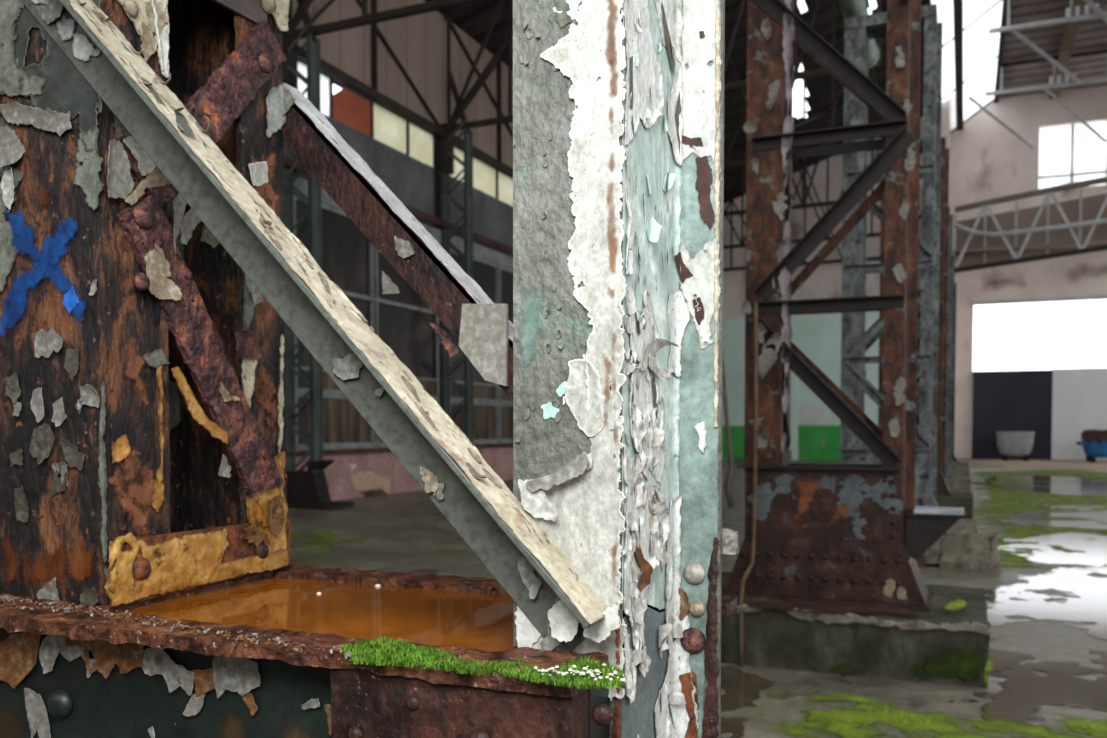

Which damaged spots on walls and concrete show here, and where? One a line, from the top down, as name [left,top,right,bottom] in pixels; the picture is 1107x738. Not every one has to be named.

corrosion [606,0,617,94]
corrosion [250,153,278,213]
corrosion [607,184,617,271]
corrosion [125,340,149,405]
corrosion [258,370,278,428]
peeling [0,0,722,738]
corrosion [605,357,616,401]
corrosion [108,449,156,533]
peeling [747,471,795,521]
peeling [816,474,904,541]
corrosion [3,535,92,584]
corrosion [737,600,919,615]